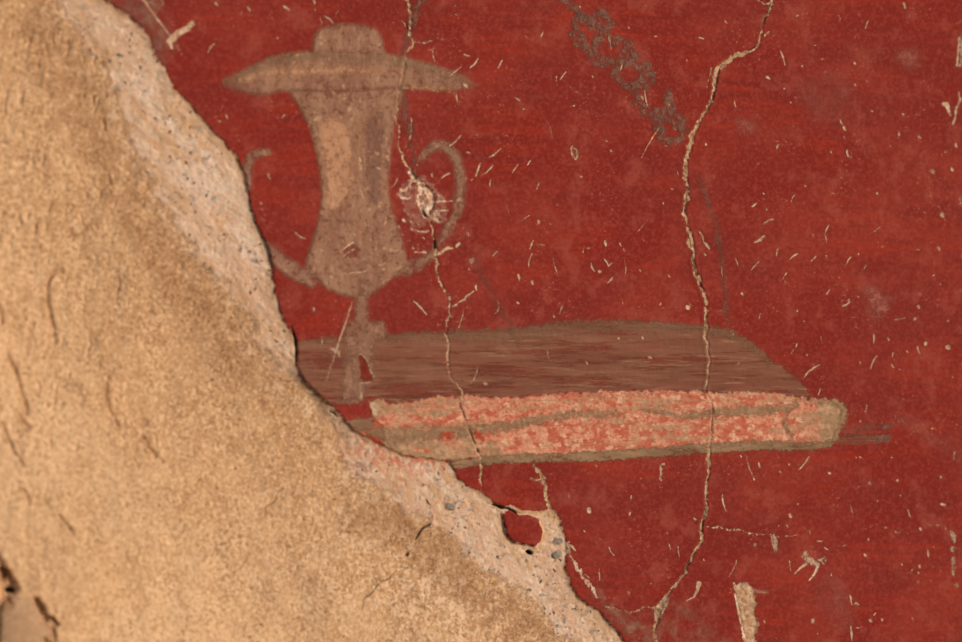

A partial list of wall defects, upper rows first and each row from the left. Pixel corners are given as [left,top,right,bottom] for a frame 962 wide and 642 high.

crack [394,0,438,186]
flaking render [56,0,624,642]
crack [425,216,516,514]
crack [567,0,796,642]
peeling [731,560,759,642]